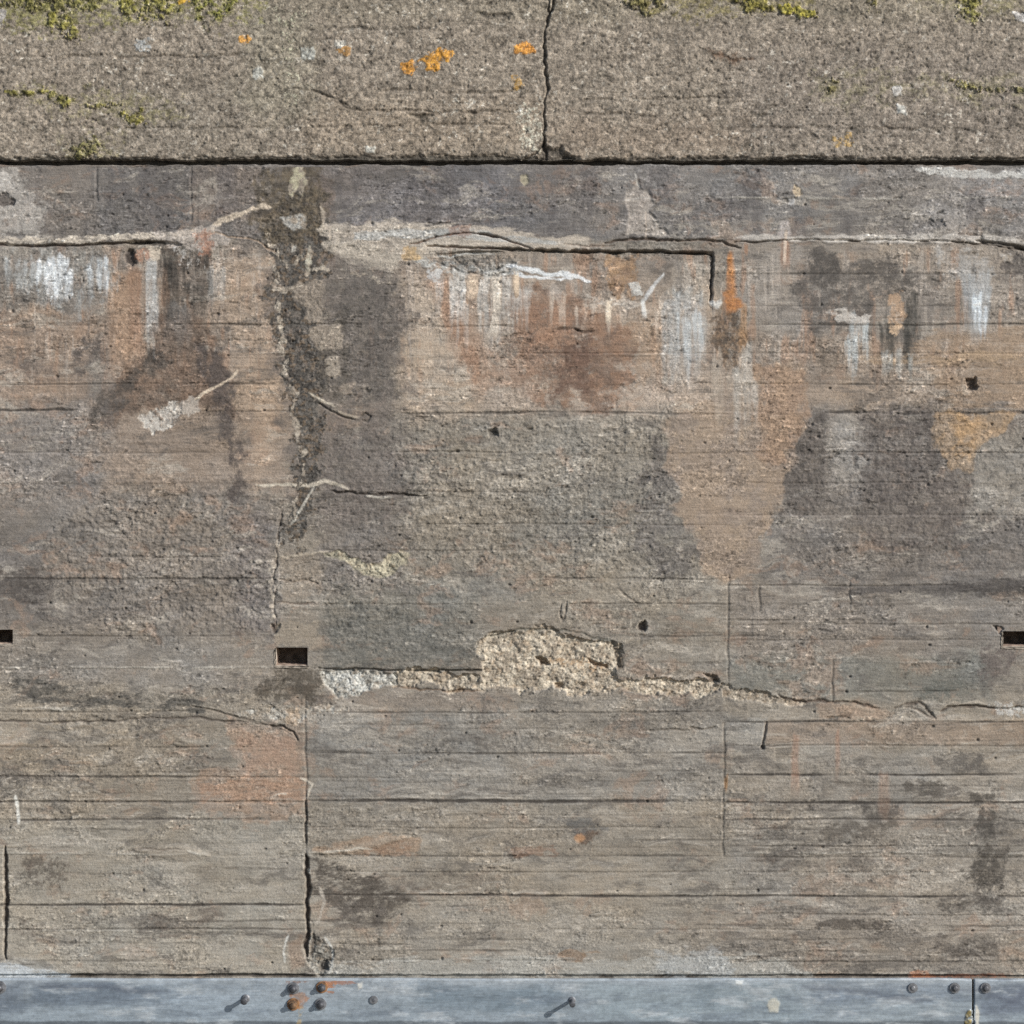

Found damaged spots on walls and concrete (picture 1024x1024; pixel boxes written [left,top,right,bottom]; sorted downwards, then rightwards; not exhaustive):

crack [292,0,575,161]
crack [0,201,277,270]
crack [408,231,1024,310]
leakage [0,166,761,553]
corrosion [658,243,814,586]
leakage [778,242,1024,560]
crack [254,478,428,651]
spalling [237,623,807,727]
spalling [636,618,661,635]
leakage [627,425,698,591]
crack [776,693,1024,722]
crack [274,777,316,960]